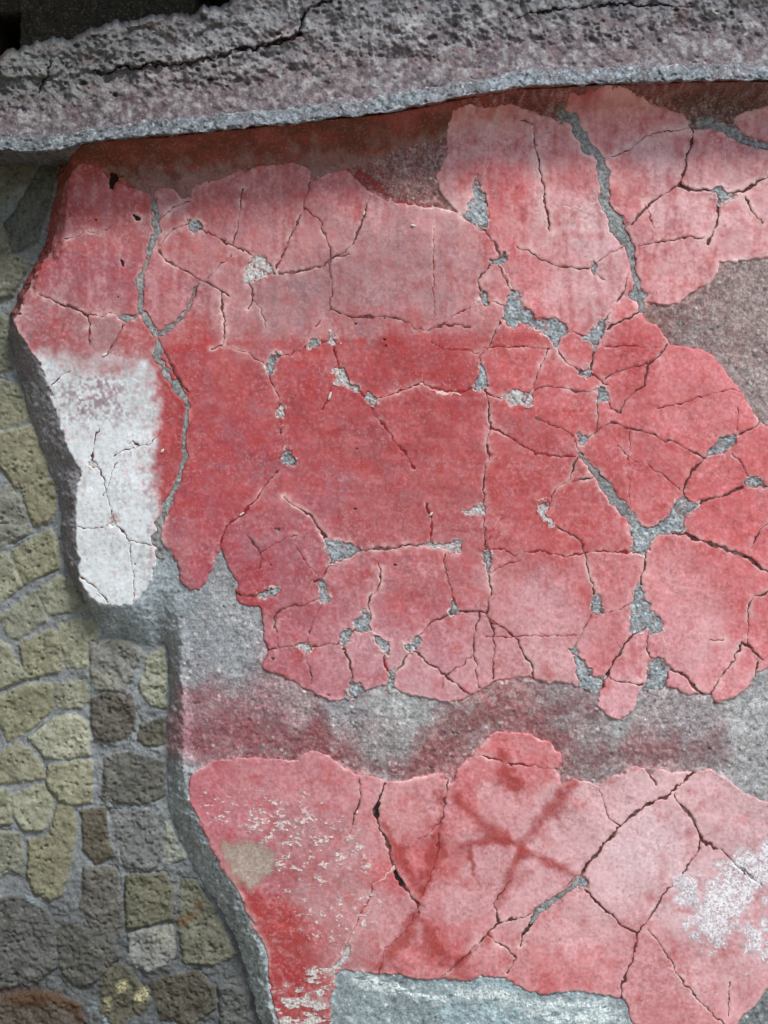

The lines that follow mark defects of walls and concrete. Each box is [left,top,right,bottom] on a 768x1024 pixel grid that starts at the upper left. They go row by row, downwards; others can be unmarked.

crack [38,60,52,93]
crack [94,0,332,76]
crack [39,103,768,695]
peeling [646,264,768,426]
spalling [480,550,494,578]
peeling [185,561,768,800]
crack [482,755,557,769]
crack [345,779,449,975]
peeling [242,790,628,1024]
crack [442,770,762,1024]
water stain [673,837,768,975]